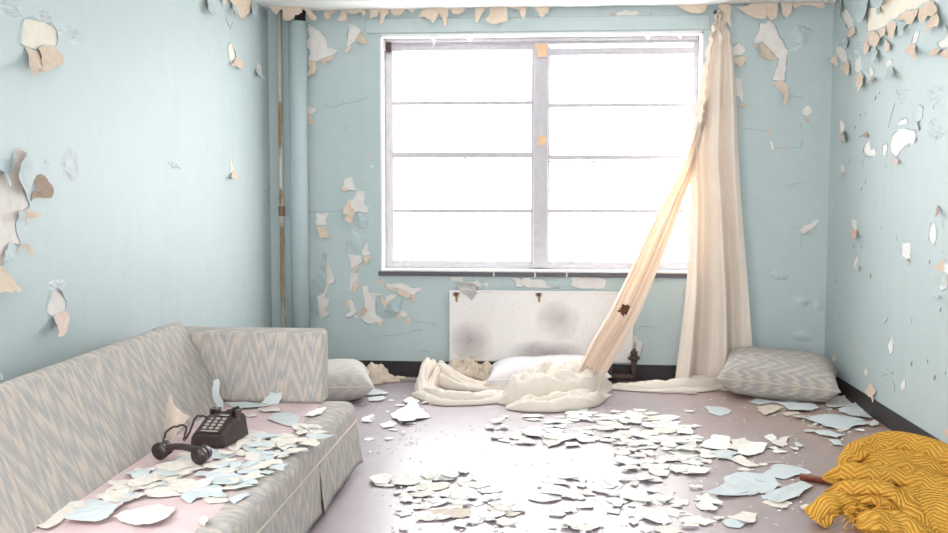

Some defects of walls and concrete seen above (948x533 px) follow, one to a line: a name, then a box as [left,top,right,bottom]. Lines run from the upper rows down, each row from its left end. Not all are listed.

peeling [18,16,65,76]
peeling [207,0,948,105]
peeling [839,104,923,166]
peeling [0,148,54,293]
peeling [315,211,330,238]
peeling [340,177,370,223]
peeling [901,240,912,266]
peeling [309,251,336,318]
peeling [344,242,421,325]
peeling [451,276,489,300]
peeling [511,277,608,290]